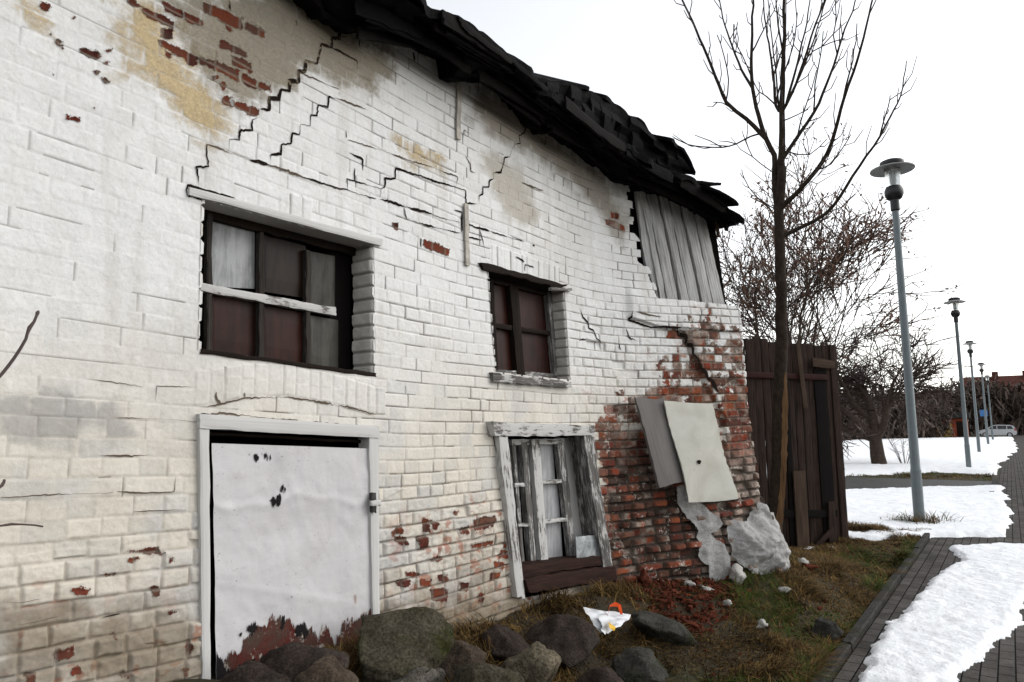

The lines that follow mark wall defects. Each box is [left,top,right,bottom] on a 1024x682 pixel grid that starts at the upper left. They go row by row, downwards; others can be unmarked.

peeling [127,0,272,117]
crack [186,32,546,268]
peeling [423,239,449,256]
peeling [605,212,625,232]
crack [580,309,719,393]
spalling [594,306,774,587]
peeling [391,517,485,603]
peeling [454,511,508,581]